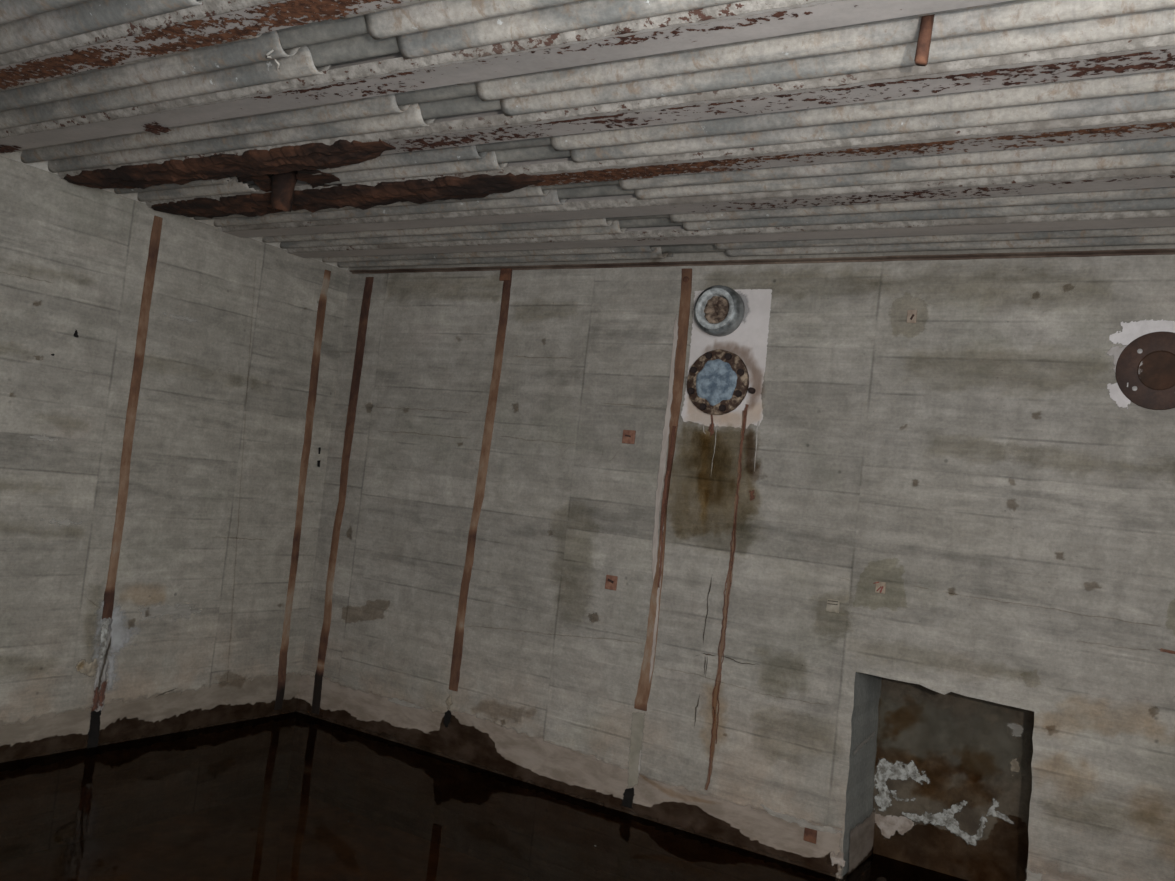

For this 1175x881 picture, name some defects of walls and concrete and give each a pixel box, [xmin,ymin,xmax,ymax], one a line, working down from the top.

corrosion [517,11,812,62]
corrosion [248,69,434,100]
corrosion [387,49,1175,152]
corrosion [296,170,342,188]
corrosion [529,122,1175,186]
corrosion [694,184,1033,212]
peeling [1107,345,1131,409]
corrosion [705,404,755,790]
spalling [91,617,113,712]
leakage [0,601,1025,879]
leakage [1026,863,1093,881]